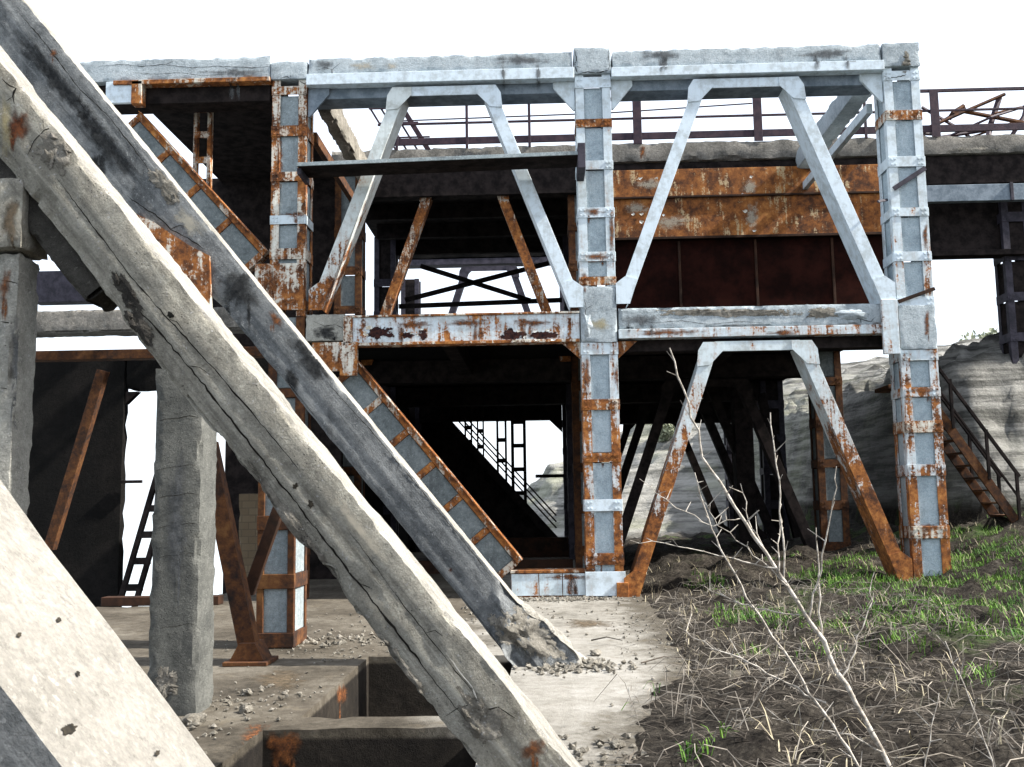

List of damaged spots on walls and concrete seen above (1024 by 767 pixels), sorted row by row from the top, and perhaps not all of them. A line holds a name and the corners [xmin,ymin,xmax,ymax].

rust [8,113,27,150]
rust [266,271,298,305]
rust [399,321,425,340]
rust [455,320,483,340]
rust [515,319,544,339]
crack [57,179,513,724]
spalling [487,606,568,662]
rust [245,725,297,767]